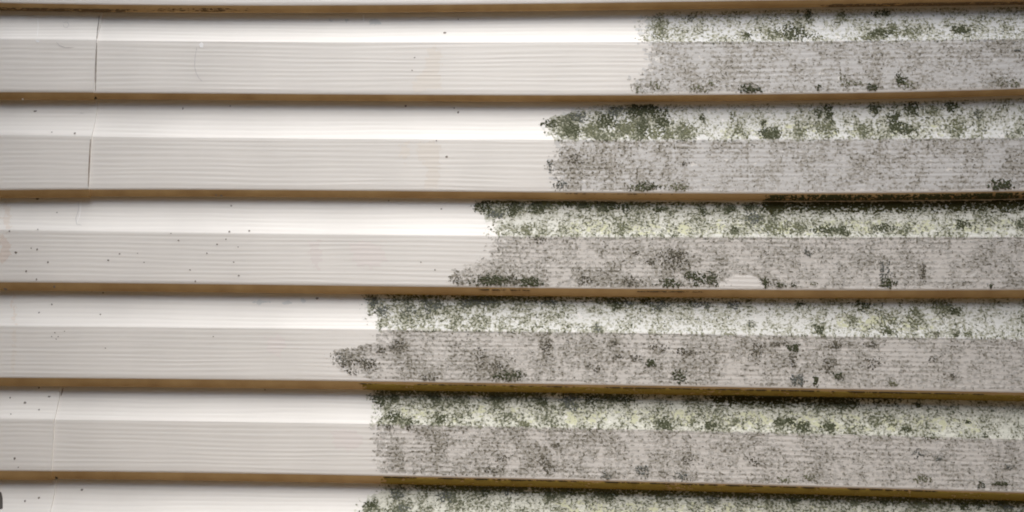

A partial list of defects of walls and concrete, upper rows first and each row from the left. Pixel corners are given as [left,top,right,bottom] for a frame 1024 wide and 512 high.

crack [93,20,101,91]
damp [324,7,1024,512]